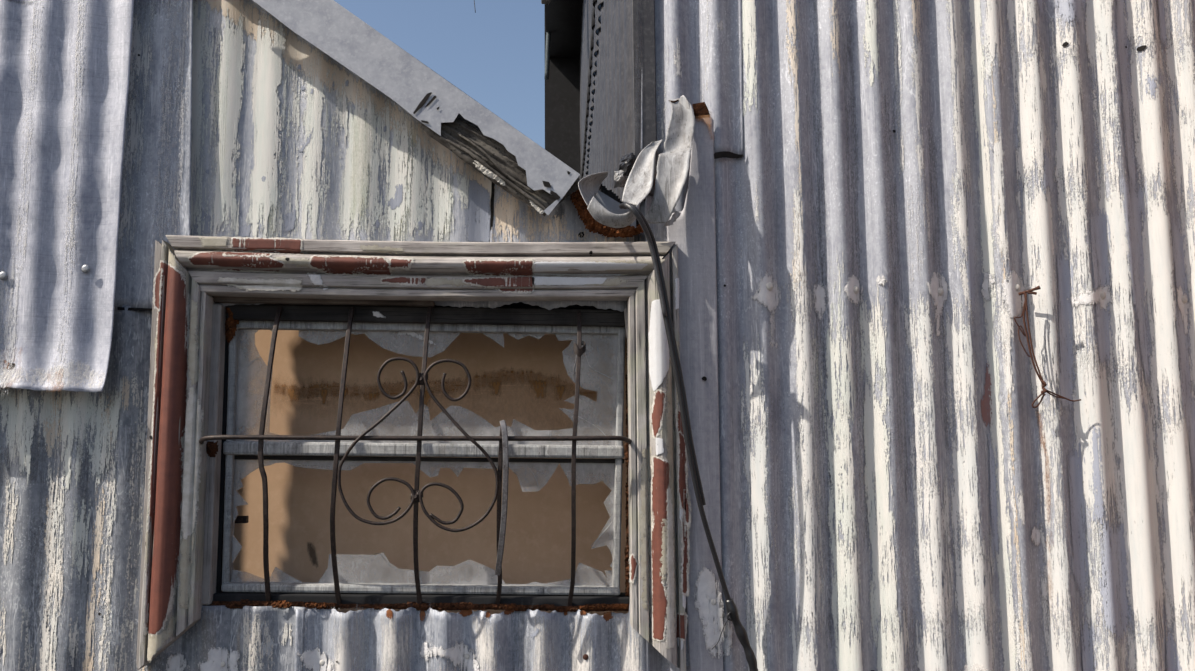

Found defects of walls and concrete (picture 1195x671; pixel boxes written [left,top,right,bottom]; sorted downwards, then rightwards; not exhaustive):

peeling [0,0,665,671]
rust [205,366,629,612]
rust [570,189,644,238]
peeling [616,278,692,671]
peeling [740,0,1195,671]